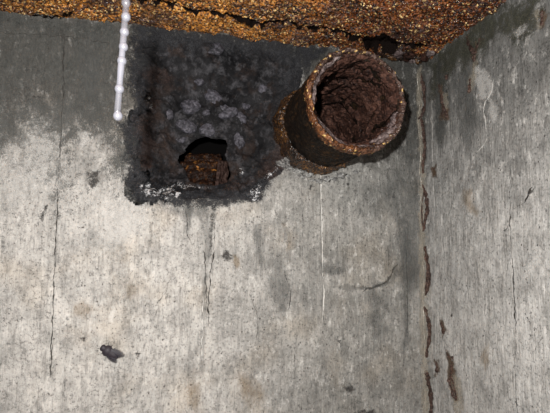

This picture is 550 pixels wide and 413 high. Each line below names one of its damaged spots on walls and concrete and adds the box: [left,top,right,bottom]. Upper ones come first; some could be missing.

crack [1,10,109,100]
spalling [134,35,360,201]
corrosion [312,49,436,148]
crack [42,133,62,376]
corrosion [421,184,430,232]
corrosion [423,246,431,296]
corrosion [423,306,440,413]
corrosion [446,352,459,403]